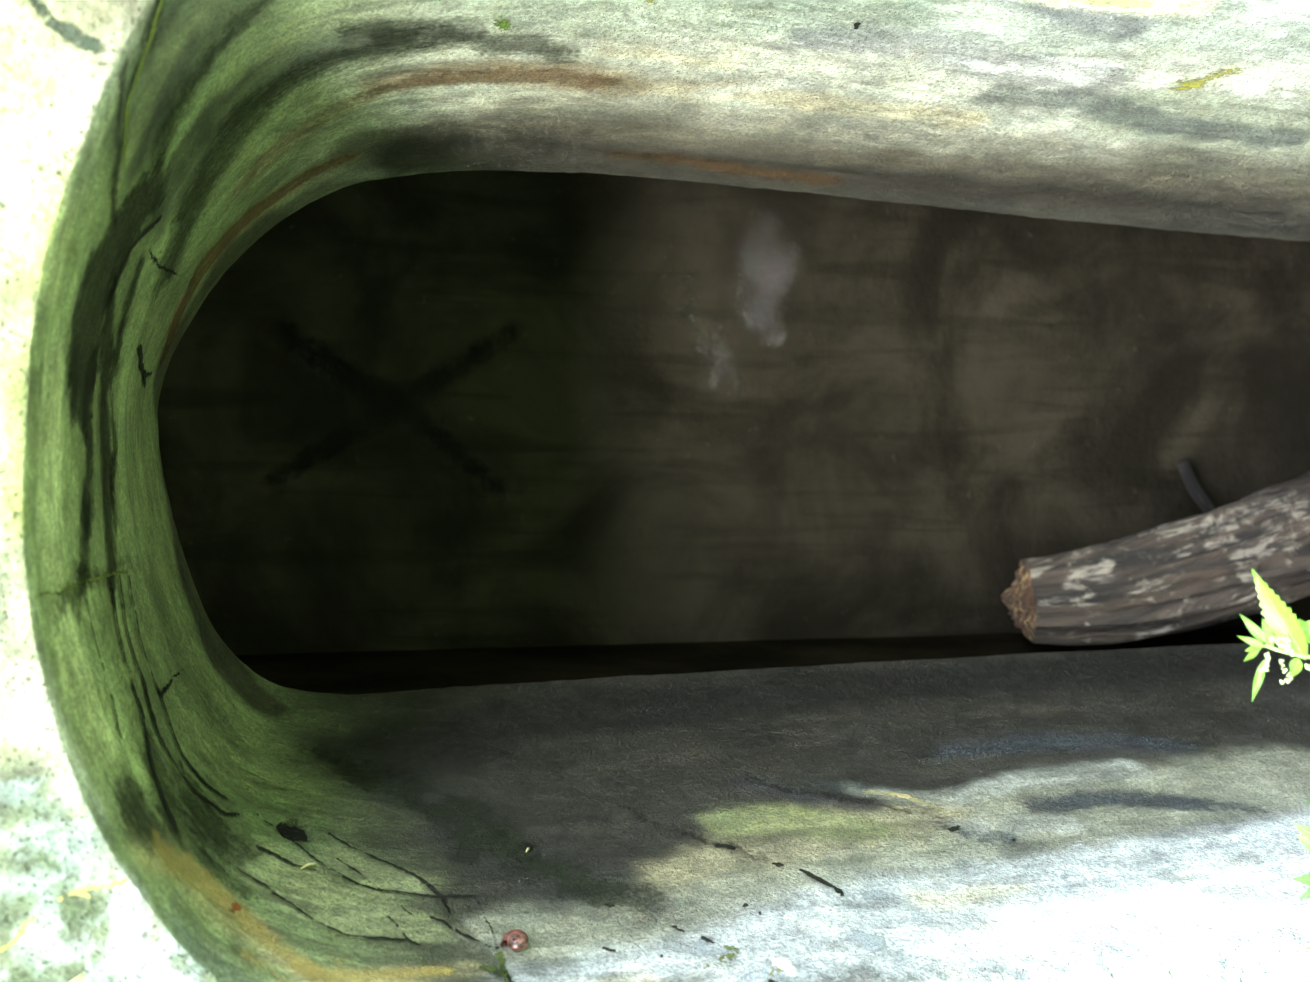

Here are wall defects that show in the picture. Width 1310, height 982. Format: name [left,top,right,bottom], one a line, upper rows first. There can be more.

leakage [67,0,572,605]
crack [39,560,515,982]